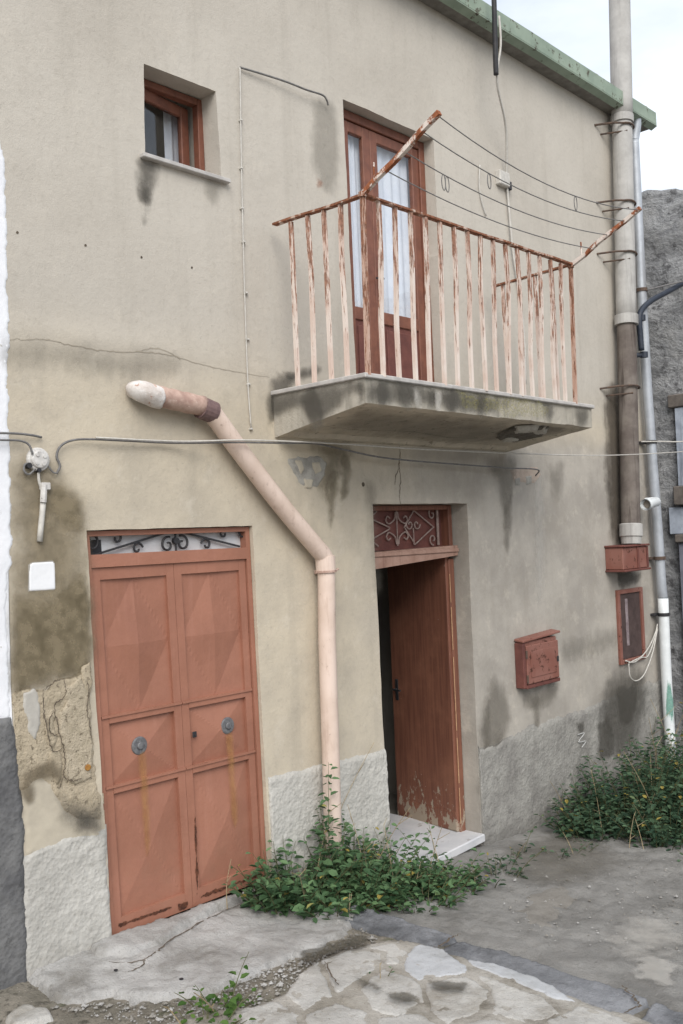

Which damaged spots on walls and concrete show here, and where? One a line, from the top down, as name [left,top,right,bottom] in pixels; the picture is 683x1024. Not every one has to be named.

water stain [140,162,154,200]
crack [12,338,259,376]
water stain [270,370,496,427]
spalling [496,425,548,442]
flaking render [288,456,327,489]
water stain [15,474,89,688]
water stain [599,675,643,756]
flaking render [11,662,105,820]
rust [118,902,188,927]